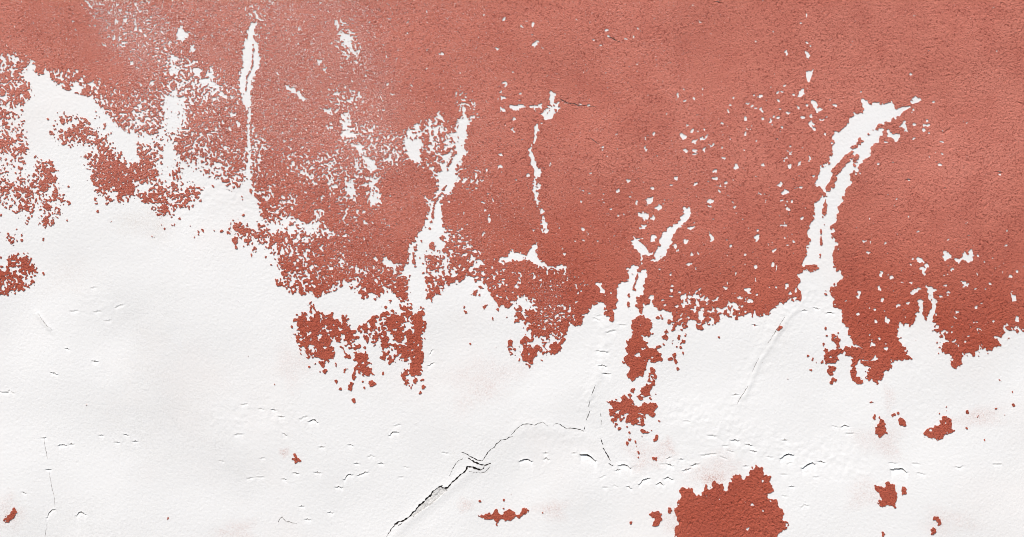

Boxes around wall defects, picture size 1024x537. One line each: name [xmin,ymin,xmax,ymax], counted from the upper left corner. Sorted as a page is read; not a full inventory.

peeling [495,71,569,233]
peeling [676,82,739,170]
peeling [745,69,827,140]
peeling [686,169,759,242]
peeling [777,181,803,254]
peeling [942,245,993,276]
crack [388,313,613,534]